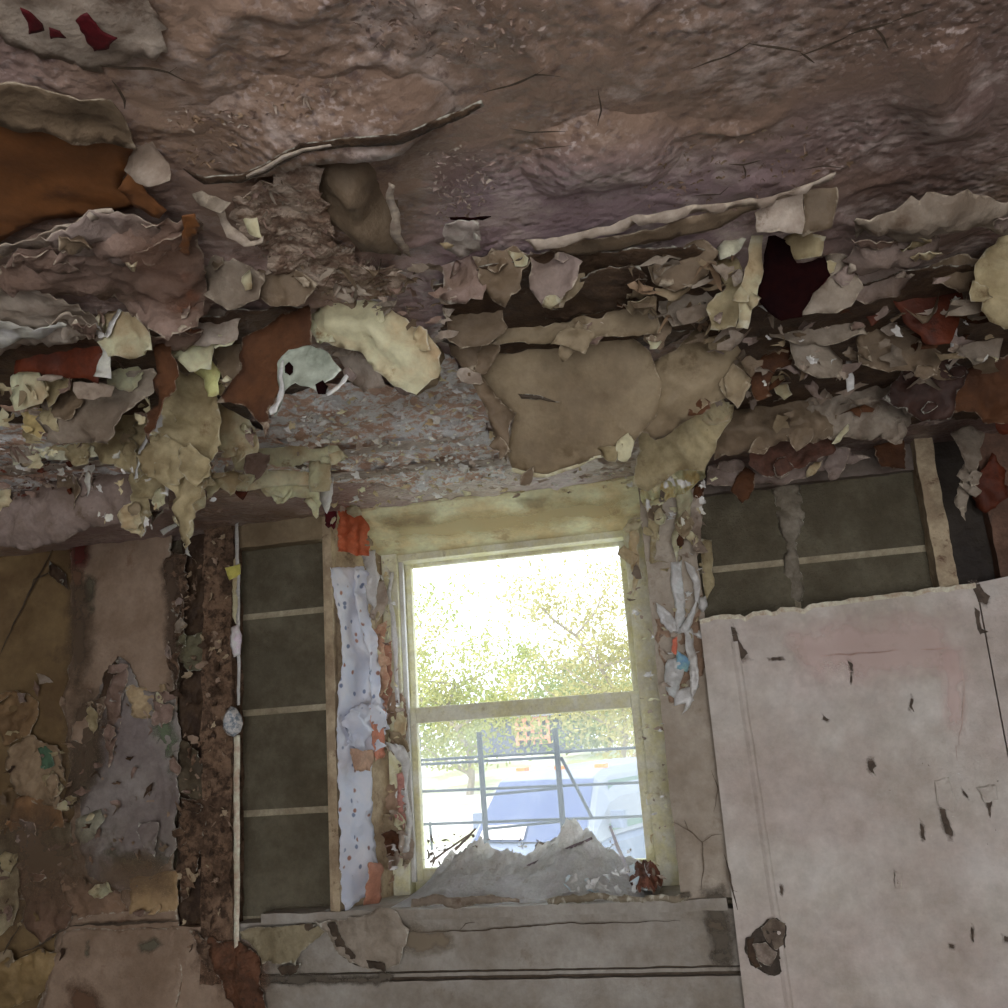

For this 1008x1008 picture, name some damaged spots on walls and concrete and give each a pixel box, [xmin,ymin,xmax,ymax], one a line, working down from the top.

peeling [0,0,168,73]
peeling [347,0,549,63]
peeling [167,73,351,168]
peeling [0,82,171,260]
peeling [178,124,1008,512]
peeling [0,338,159,504]
spalling [0,523,409,1008]
crack [674,820,738,910]
spalling [744,918,787,976]